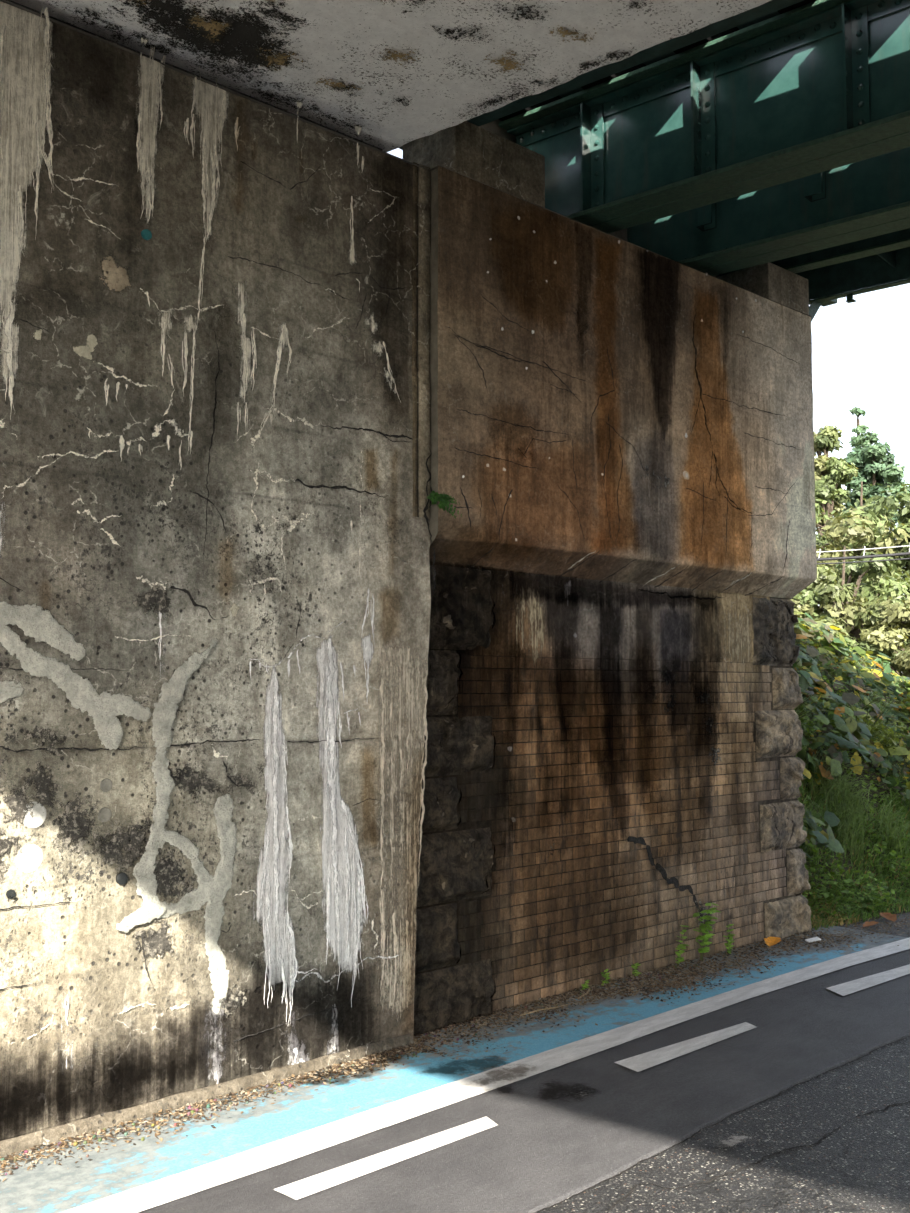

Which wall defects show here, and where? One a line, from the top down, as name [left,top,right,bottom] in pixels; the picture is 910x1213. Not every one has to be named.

efflorescence [0,1,54,420]
efflorescence [136,38,166,223]
efflorescence [159,68,240,451]
crack [228,256,407,340]
crack [1,288,800,678]
leakage [638,249,680,439]
leakage [0,562,751,1141]
crack [627,836,699,909]